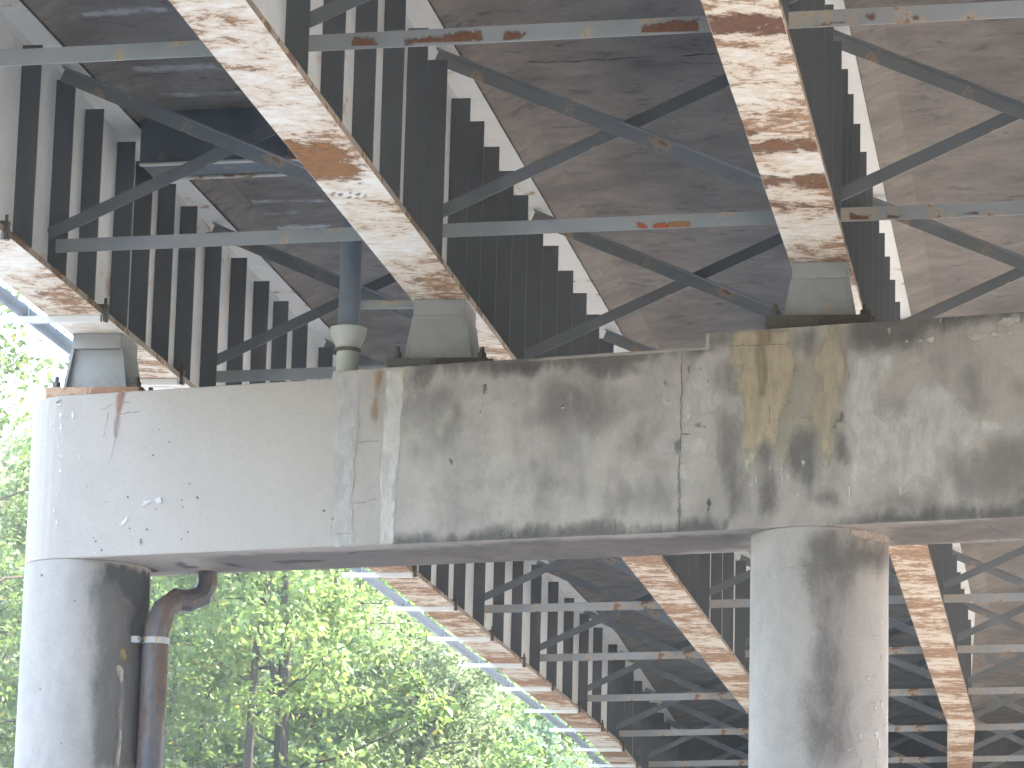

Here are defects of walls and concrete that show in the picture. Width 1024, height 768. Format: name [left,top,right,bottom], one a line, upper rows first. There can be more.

corrosion [405,30,482,46]
corrosion [504,31,526,40]
corrosion [641,13,787,36]
corrosion [745,128,818,156]
corrosion [284,137,367,182]
corrosion [762,173,828,190]
corrosion [770,202,834,210]
damp [380,353,659,544]
crack [678,355,690,530]
damp [769,432,813,482]
damp [845,503,1024,525]
damp [447,515,719,542]